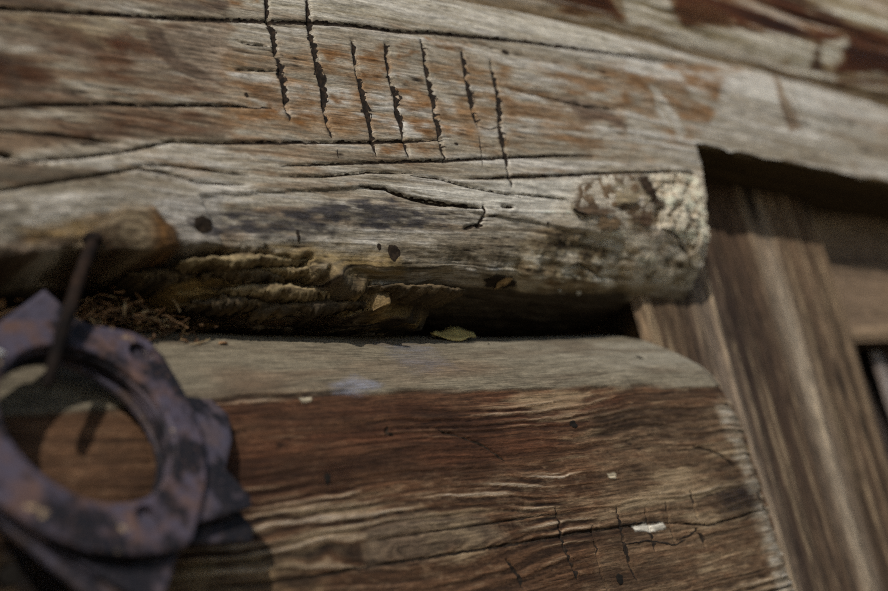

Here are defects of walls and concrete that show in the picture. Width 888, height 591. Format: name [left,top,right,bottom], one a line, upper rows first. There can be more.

crack [0,102,269,110]
crack [510,89,618,110]
crack [0,131,693,230]